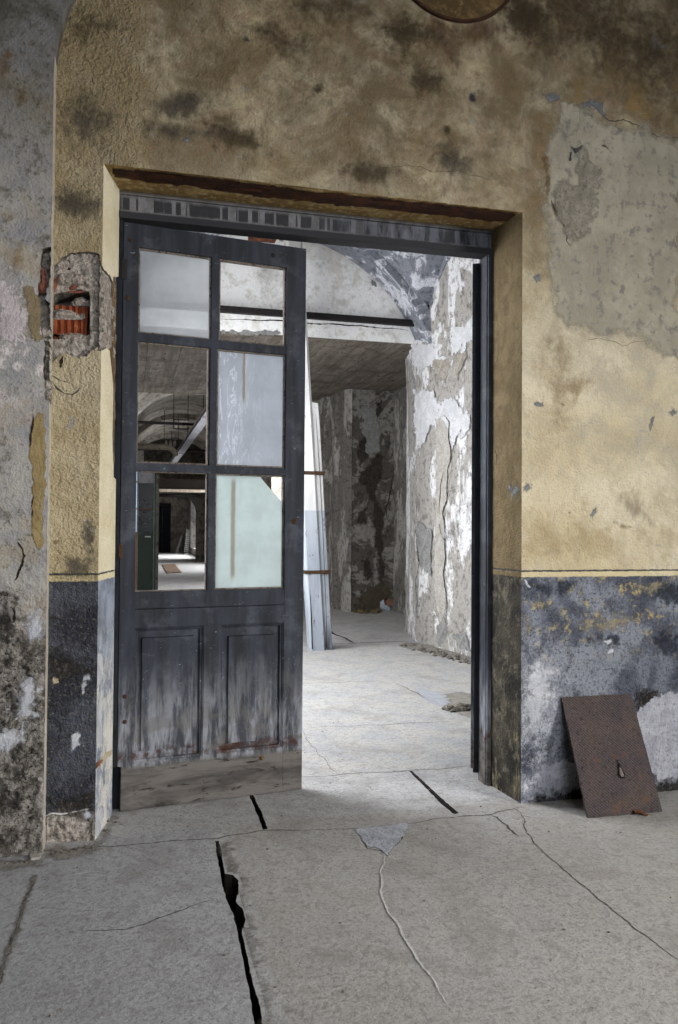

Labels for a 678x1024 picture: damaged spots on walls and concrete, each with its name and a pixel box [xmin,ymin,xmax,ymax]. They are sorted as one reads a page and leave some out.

water stain [147,93,199,138]
water stain [208,125,258,148]
corrosion [112,169,515,222]
peeling [542,93,678,358]
spalling [24,252,117,466]
crack [15,542,35,580]
crack [27,416,35,446]
water stain [27,609,46,642]
peeling [29,413,47,549]
crack [399,415,451,623]
peeling [411,317,472,647]
crack [87,807,677,964]